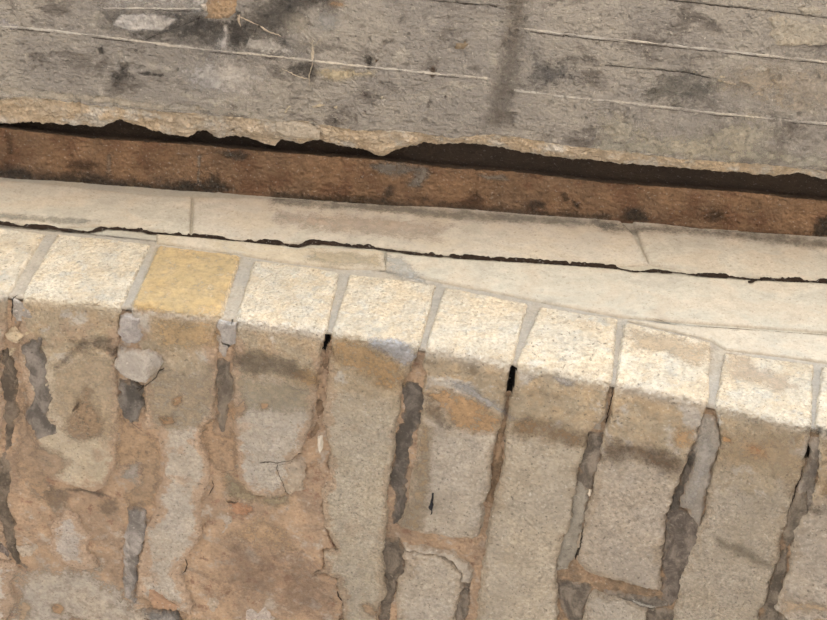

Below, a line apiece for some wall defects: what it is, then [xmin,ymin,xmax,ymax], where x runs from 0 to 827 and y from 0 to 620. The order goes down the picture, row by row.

spalling [0,96,827,179]
crack [0,221,827,283]